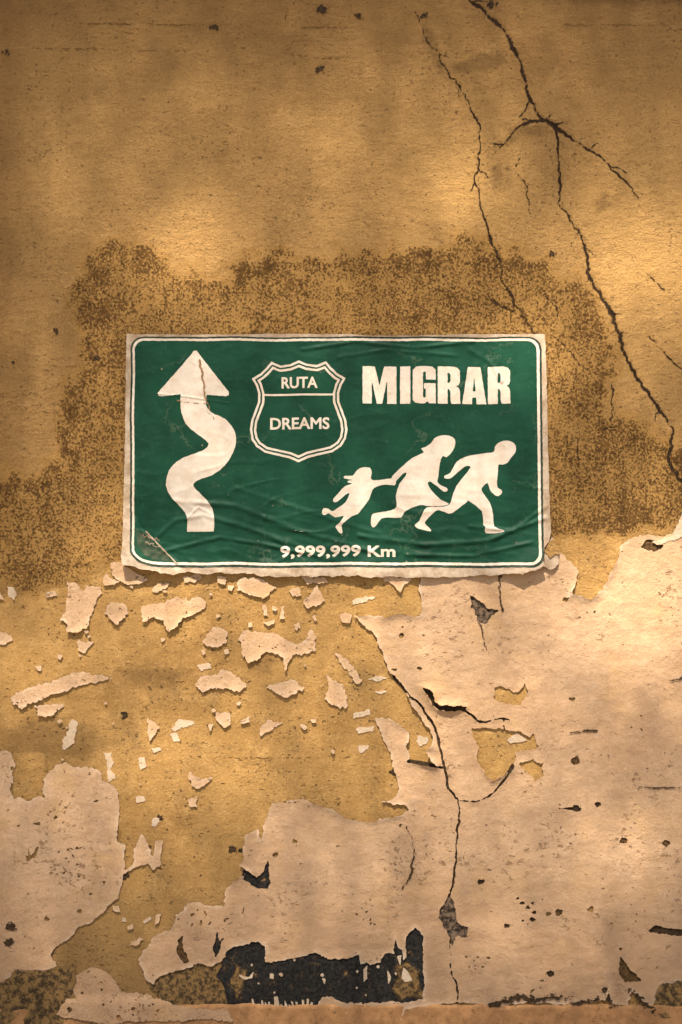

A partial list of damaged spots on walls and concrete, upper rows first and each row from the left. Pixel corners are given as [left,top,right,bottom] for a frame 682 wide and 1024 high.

crack [415,0,682,482]
leakage [0,228,682,600]
peeling [555,532,627,602]
peeling [470,596,498,624]
peeling [423,688,467,712]
peeling [0,554,434,1024]
crack [392,675,514,896]
peeling [471,727,544,781]
peeling [437,896,468,945]
crack [449,939,459,1004]
peeling [488,987,618,1008]
peeling [619,957,682,1019]